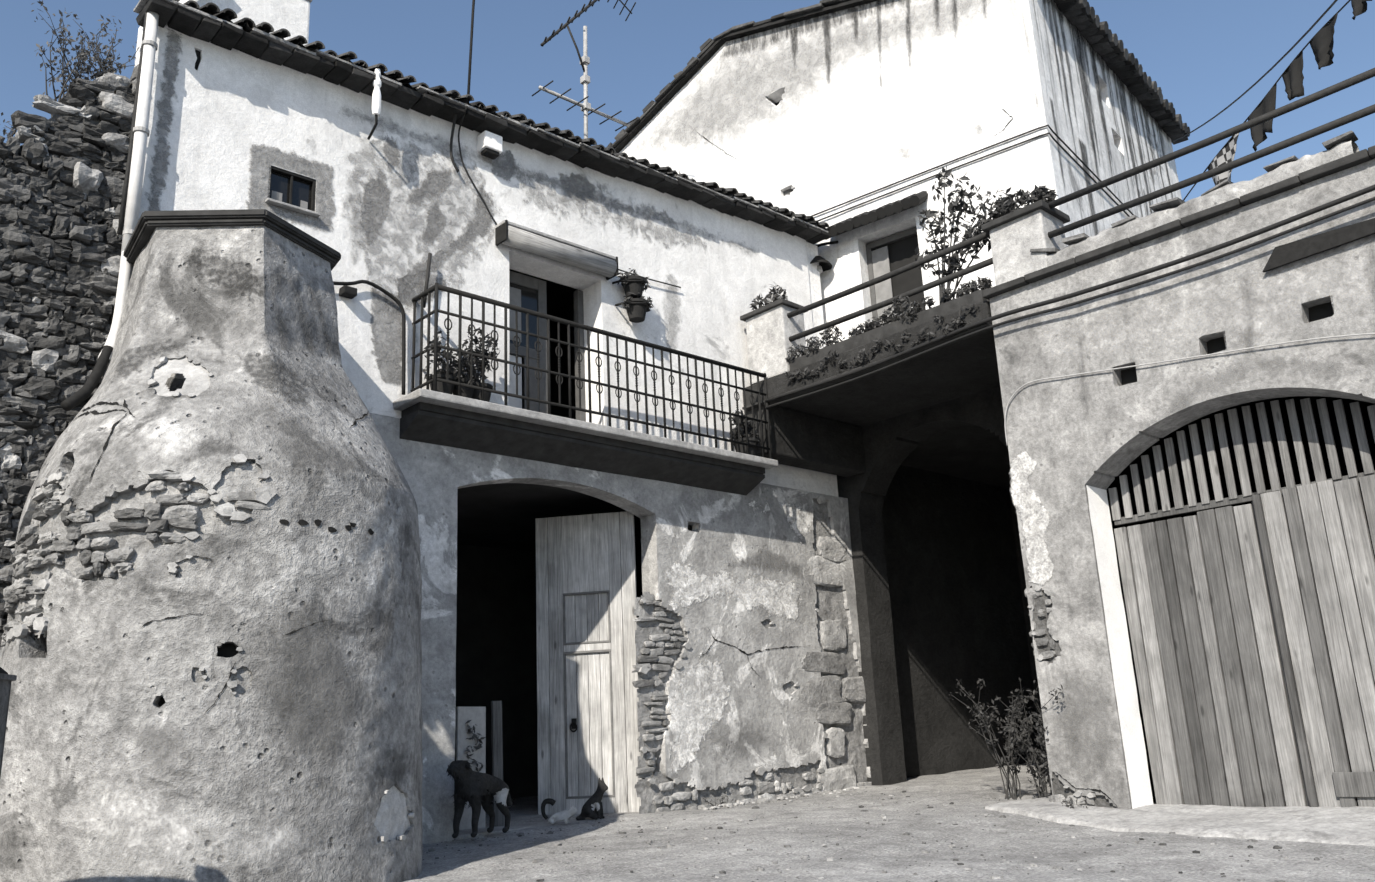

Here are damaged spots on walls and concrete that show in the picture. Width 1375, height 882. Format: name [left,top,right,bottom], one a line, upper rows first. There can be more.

water stain [656,0,985,142]
crack [75,399,135,484]
spalling [148,357,213,397]
spalling [1,454,374,647]
peeling [1010,452,1062,663]
crack [204,663,235,715]
crack [695,636,801,675]
spalling [632,496,867,814]